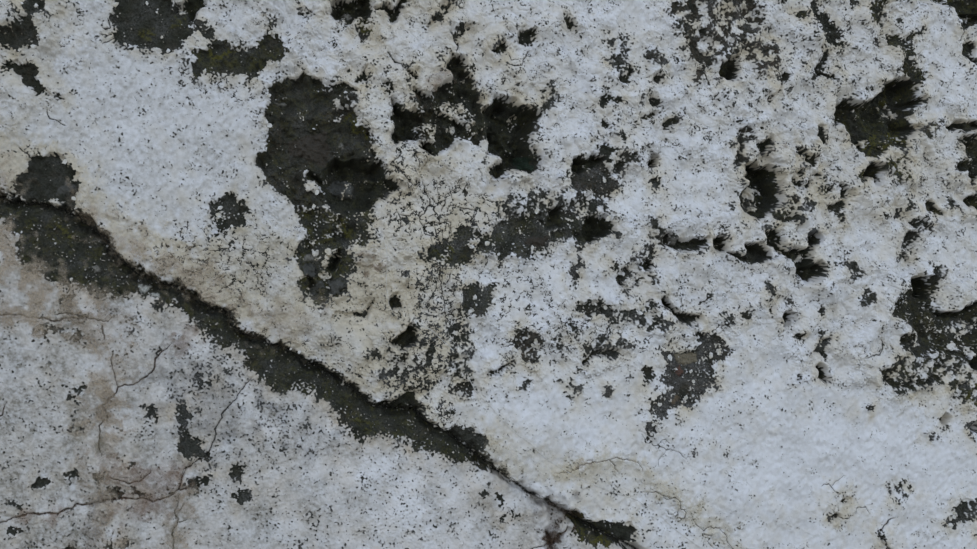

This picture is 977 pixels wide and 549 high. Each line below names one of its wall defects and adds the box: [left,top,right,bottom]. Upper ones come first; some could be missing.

peeling [0,0,65,101]
peeling [108,0,291,82]
spalling [330,0,407,43]
spalling [381,22,560,179]
peeling [663,0,791,103]
peeling [789,0,844,82]
spalling [817,0,977,262]
peeling [0,71,878,474]
crack [0,146,688,549]
spalling [880,264,977,442]
water stain [77,378,121,506]
crack [556,438,733,549]